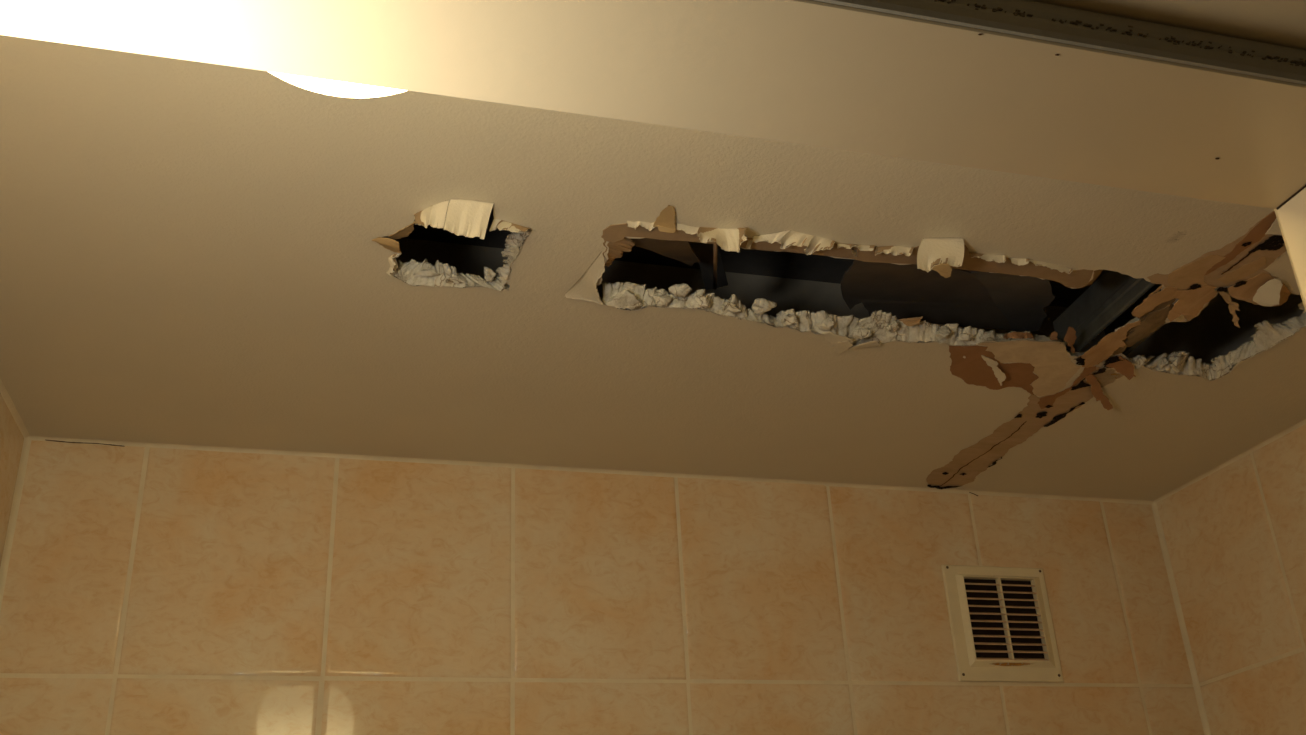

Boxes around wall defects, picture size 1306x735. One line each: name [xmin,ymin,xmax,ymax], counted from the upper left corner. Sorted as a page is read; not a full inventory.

spalling [394,230,531,291]
peeling [1147,211,1287,290]
spalling [1132,301,1306,380]
spalling [601,282,1100,487]
crack [941,422,1026,496]